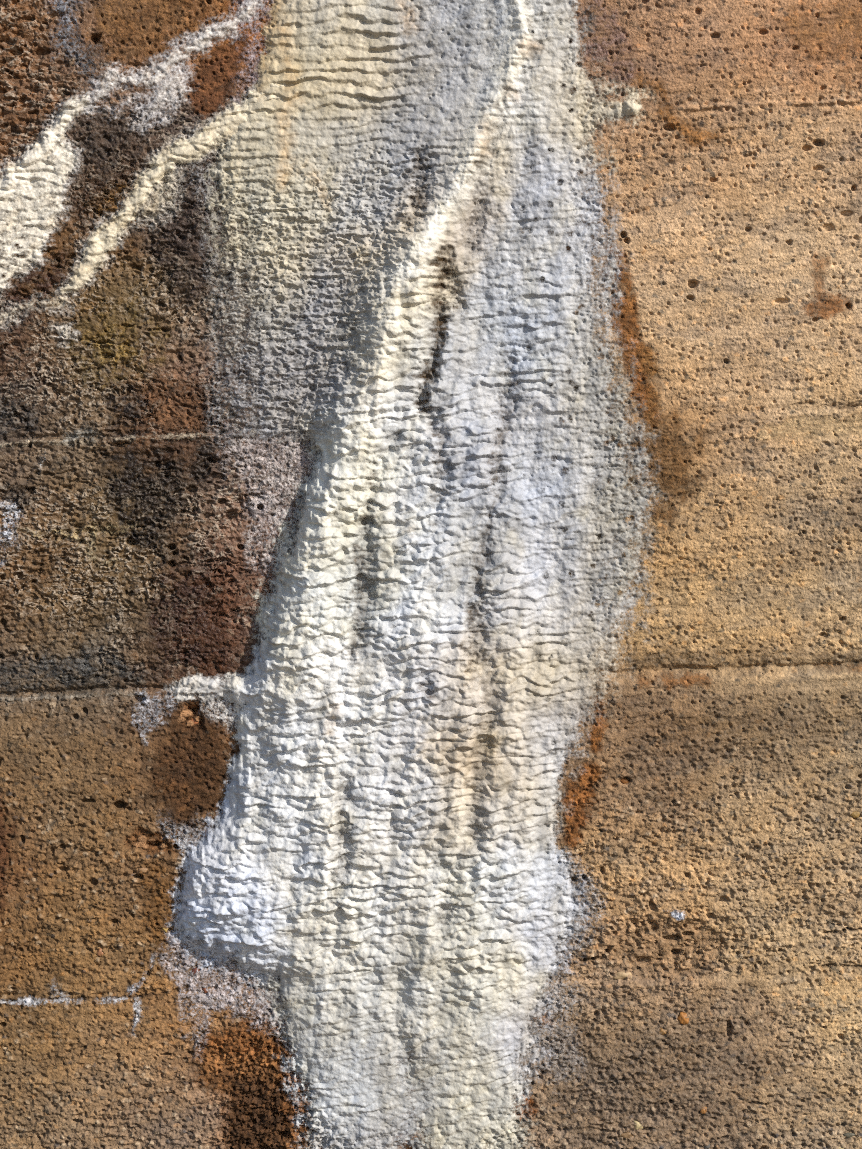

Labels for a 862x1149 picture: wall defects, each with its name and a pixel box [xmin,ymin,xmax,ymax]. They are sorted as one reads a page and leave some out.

damp [0,0,666,1149]
rust [187,1023,322,1149]
rust [514,1093,537,1122]